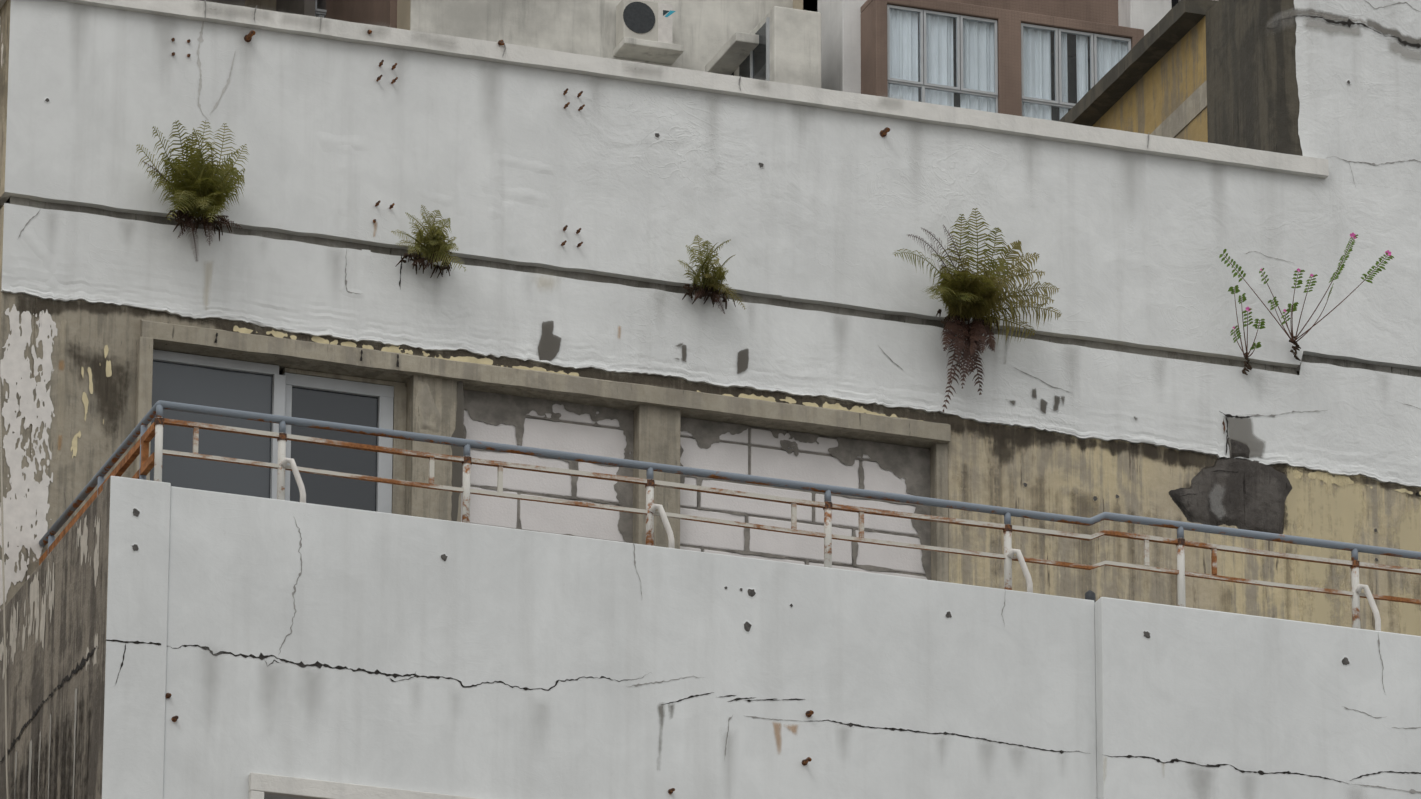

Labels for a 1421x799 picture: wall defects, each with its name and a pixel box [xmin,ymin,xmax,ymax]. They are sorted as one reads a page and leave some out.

crack [1267,1,1421,48]
crack [1327,156,1421,186]
peeling [71,345,112,459]
peeling [0,304,57,678]
peeling [76,515,100,588]
peeling [86,634,98,670]
crack [0,518,1421,793]
damp [11,697,91,799]